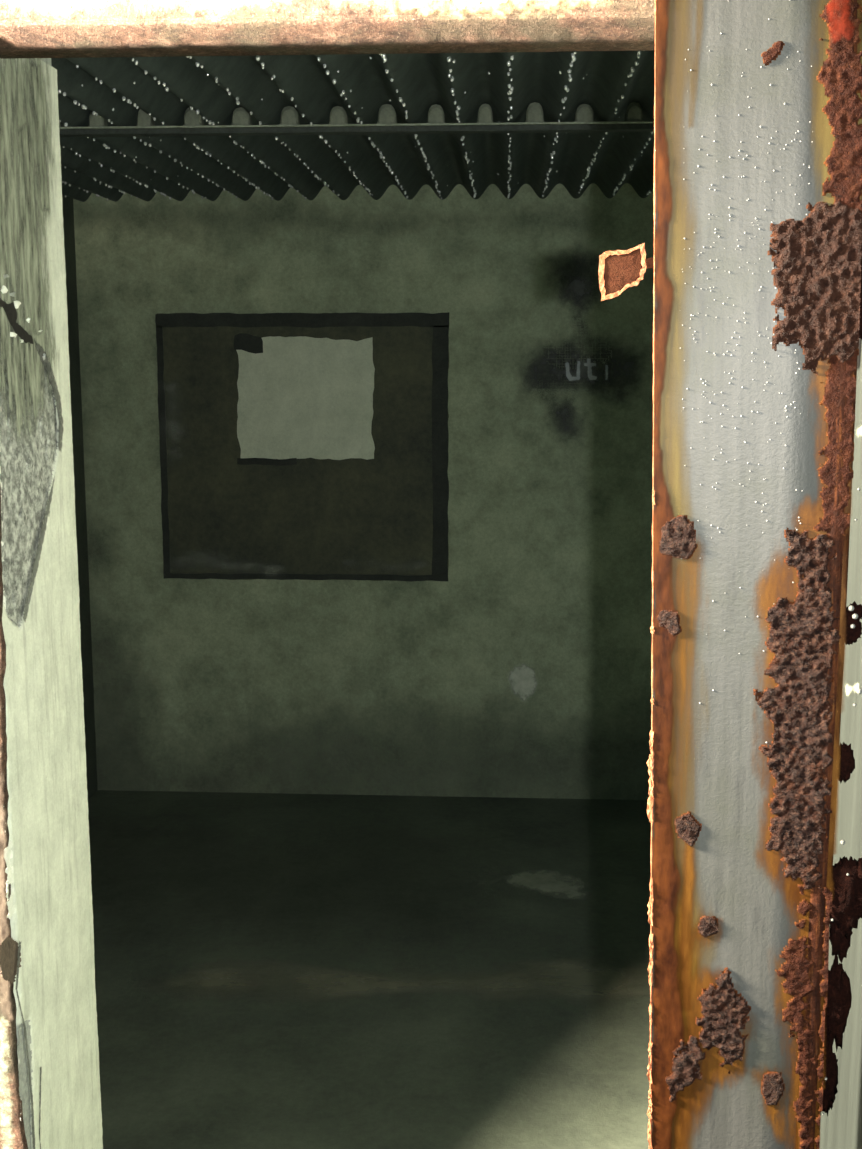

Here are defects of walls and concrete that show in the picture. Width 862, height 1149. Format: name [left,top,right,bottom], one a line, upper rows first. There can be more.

peeling [357,0,597,14]
spalling [0,274,64,627]
corrosion [598,0,751,1149]
corrosion [753,0,862,1149]
spalling [4,811,16,919]